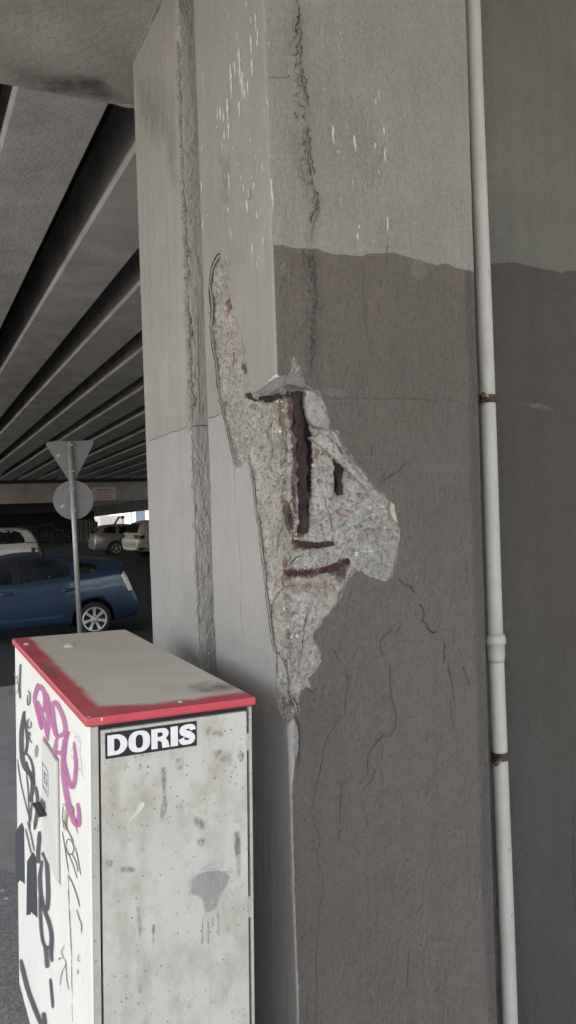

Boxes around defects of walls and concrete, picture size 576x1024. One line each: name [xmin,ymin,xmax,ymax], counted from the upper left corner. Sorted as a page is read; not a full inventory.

crack [147,251,275,653]
corrosion [247,391,330,550]
spalling [209,256,400,766]
corrosion [281,559,350,587]
crack [398,579,445,664]
crack [306,650,349,1024]